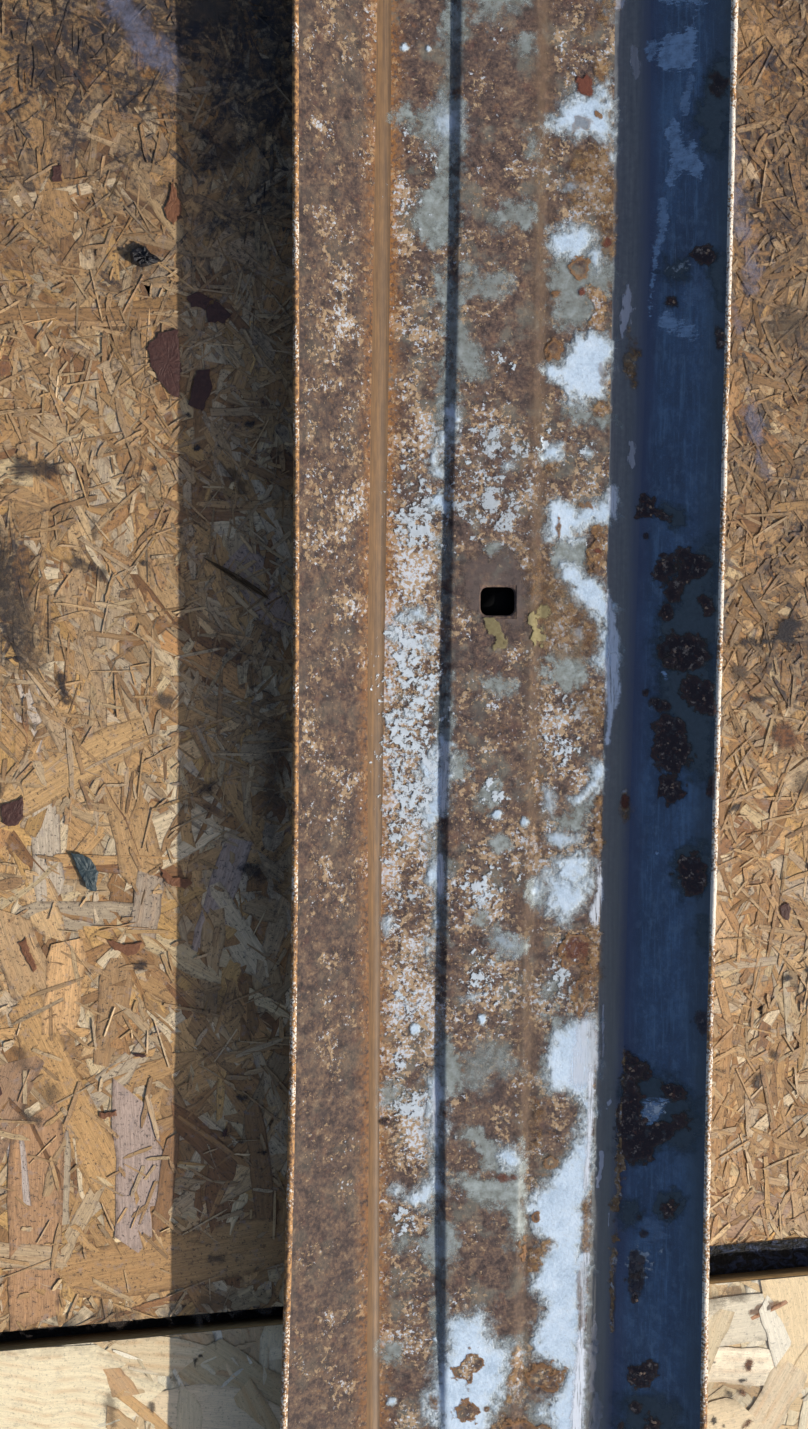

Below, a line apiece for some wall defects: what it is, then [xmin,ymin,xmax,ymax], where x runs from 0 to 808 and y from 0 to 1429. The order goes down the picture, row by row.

corrosion [576,57,608,119]
corrosion [566,143,617,330]
corrosion [579,501,608,574]
corrosion [642,537,727,808]
corrosion [591,795,606,854]
corrosion [669,839,718,948]
corrosion [558,927,604,1016]
corrosion [518,1211,551,1274]
corrosion [581,1198,591,1253]
corrosion [608,1049,705,1333]
corrosion [429,1346,568,1429]
corrosion [617,1359,663,1429]